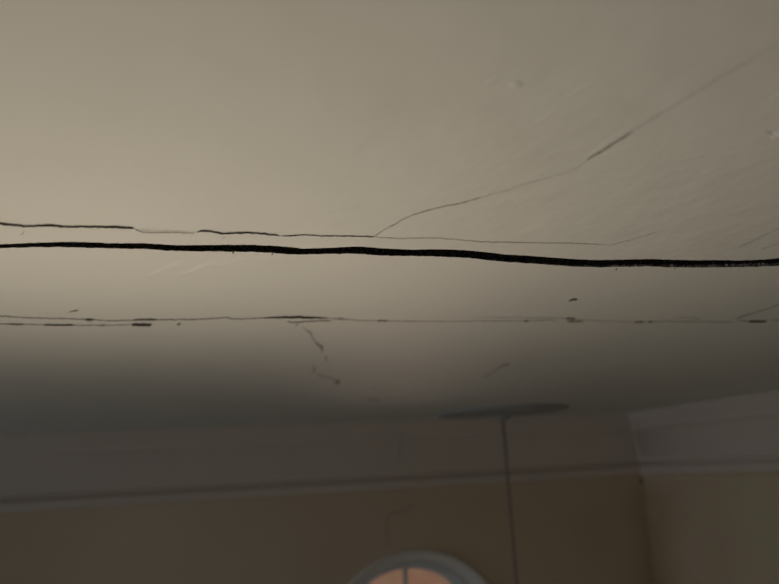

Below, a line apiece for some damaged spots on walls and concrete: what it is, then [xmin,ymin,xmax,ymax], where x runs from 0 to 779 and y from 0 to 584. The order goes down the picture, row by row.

crack [0,222,779,270]
crack [45,318,93,326]
crack [114,317,230,326]
crack [253,315,329,323]